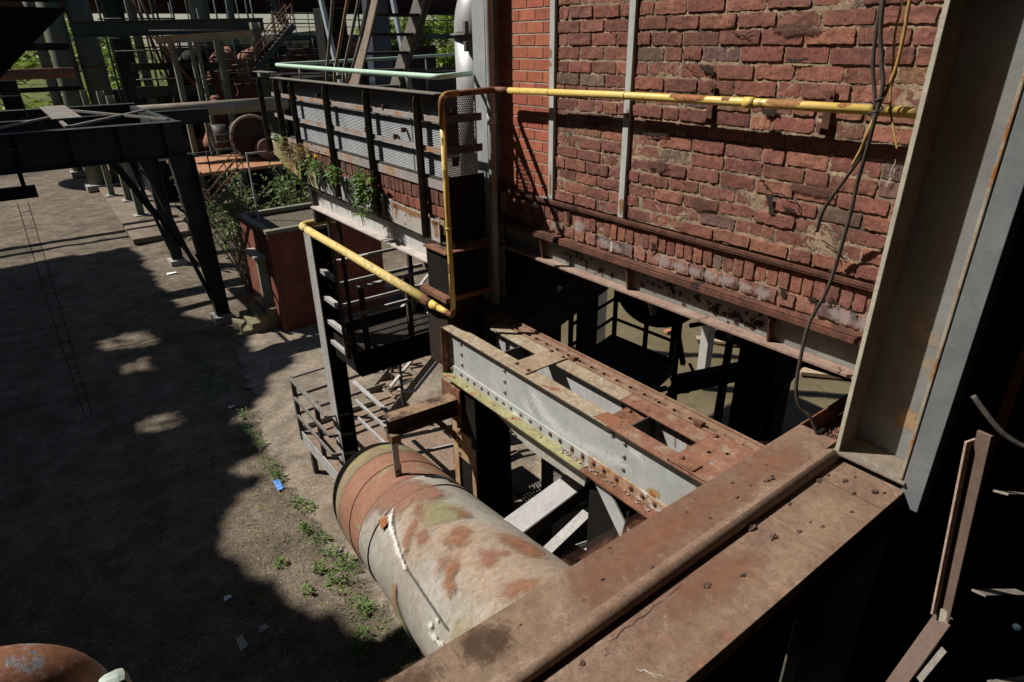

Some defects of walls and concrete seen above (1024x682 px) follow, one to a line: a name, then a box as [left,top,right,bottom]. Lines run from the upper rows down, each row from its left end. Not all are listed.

rust [669,94,707,103]
rust [766,99,804,108]
damp [658,257,768,298]
damp [832,309,866,328]
rust [594,402,629,429]
rust [560,446,660,512]
rust [403,503,428,554]
rust [436,507,472,597]
peeling [367,478,552,607]
rust [477,534,547,565]